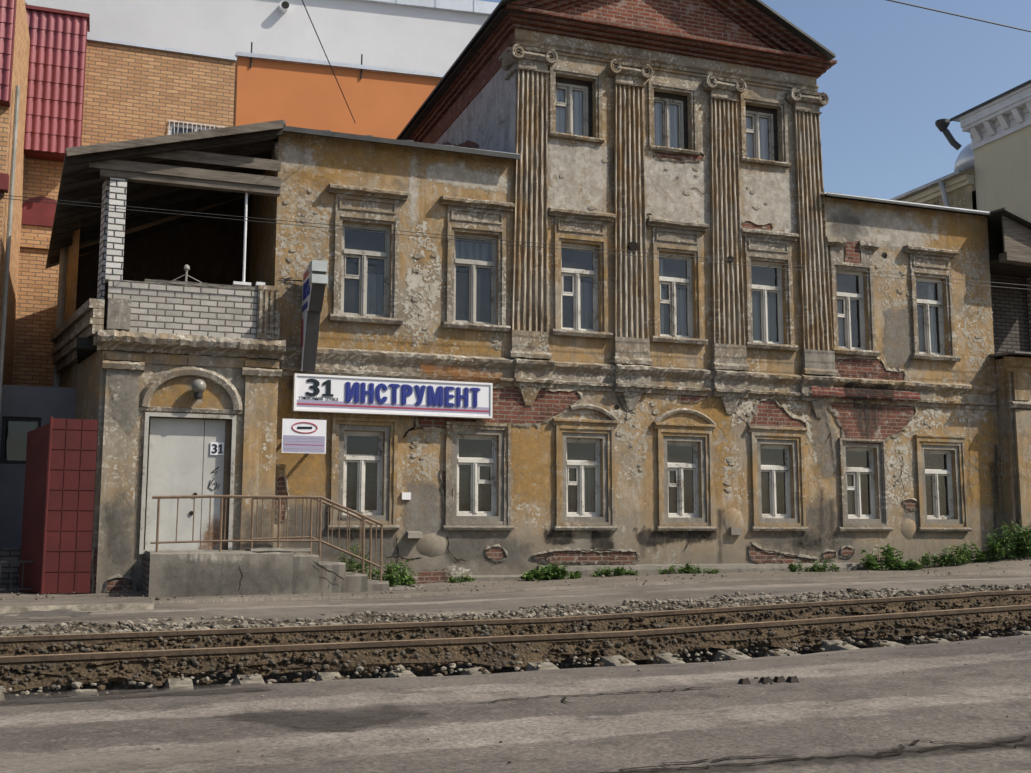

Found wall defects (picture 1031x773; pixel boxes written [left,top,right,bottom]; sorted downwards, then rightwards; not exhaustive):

flaking render [740,169,797,232]
flaking render [407,386,709,503]
flaking render [731,355,990,511]
spalling [484,543,508,563]
spalling [532,547,640,566]
spalling [748,543,856,564]